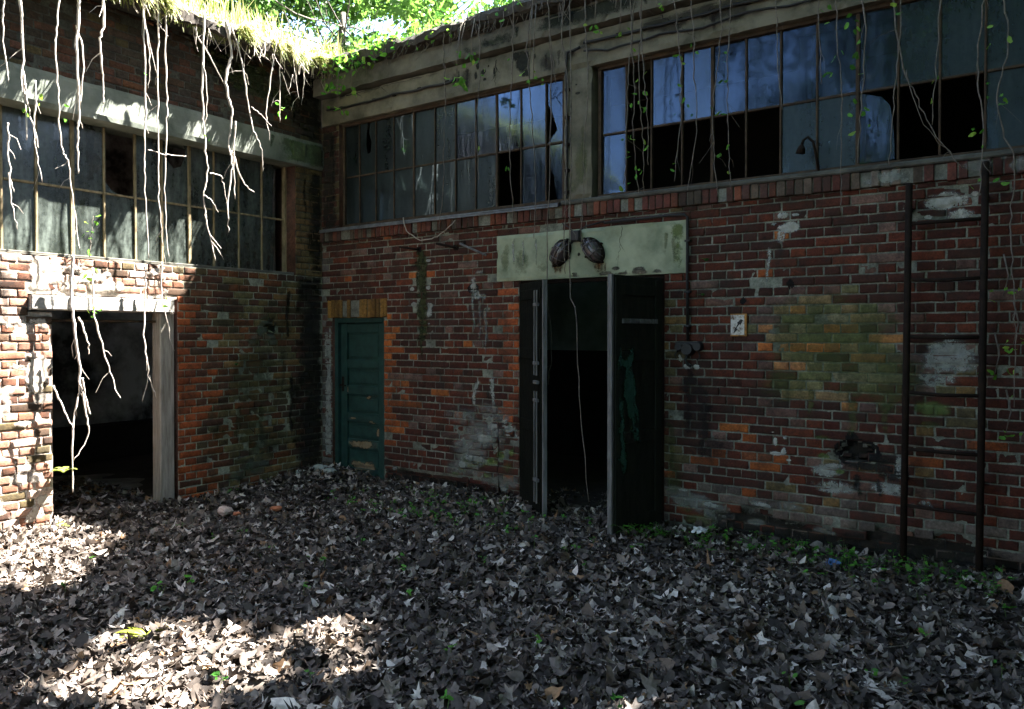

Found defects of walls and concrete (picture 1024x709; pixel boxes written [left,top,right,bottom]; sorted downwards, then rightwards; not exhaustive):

spalling [924,191,979,219]
flaking render [766,212,799,282]
water stain [470,271,490,351]
water stain [448,379,518,491]
water stain [812,441,909,496]